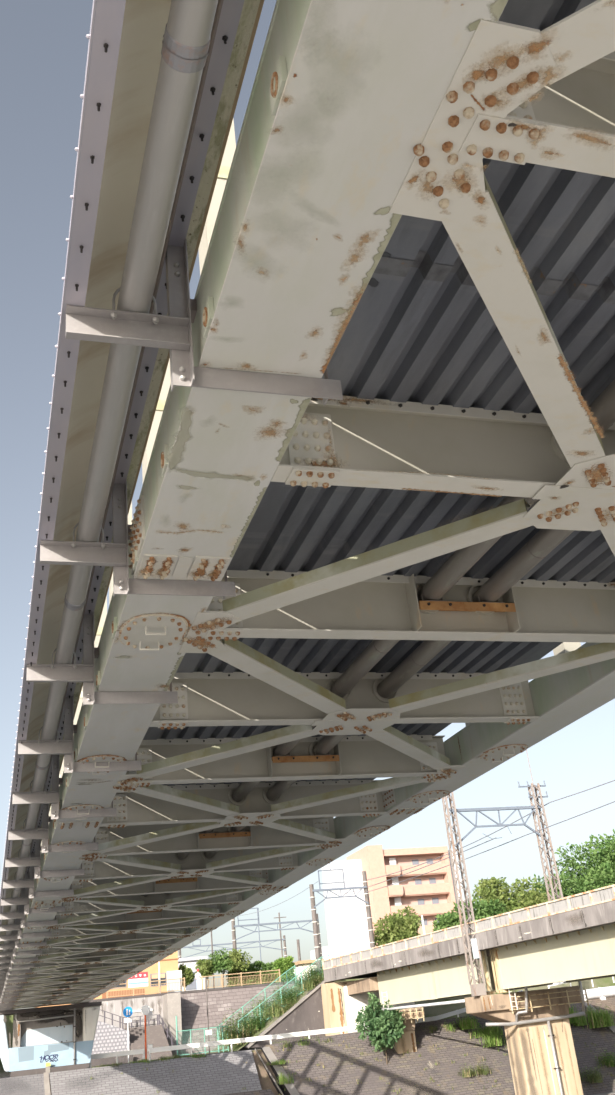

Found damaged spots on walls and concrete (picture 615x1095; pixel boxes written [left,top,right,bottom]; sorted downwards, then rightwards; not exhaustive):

corrosion [528,40,551,54]
corrosion [471,53,514,80]
corrosion [557,354,605,439]
corrosion [146,610,226,648]